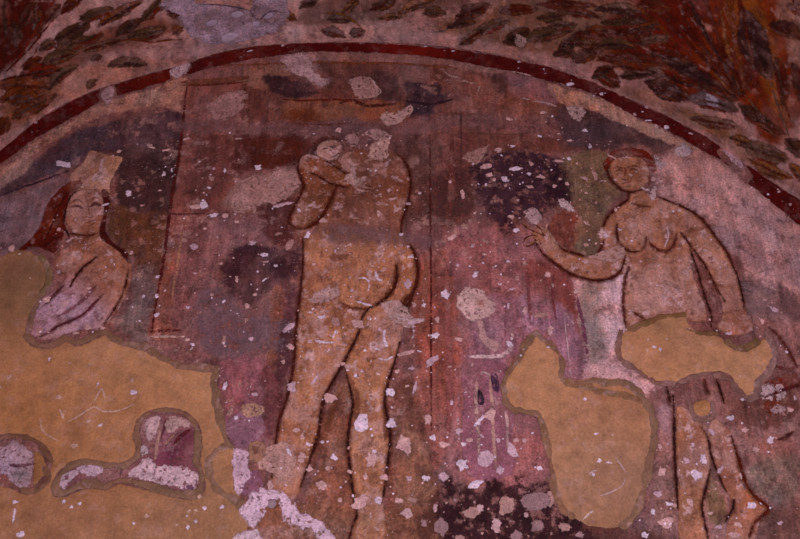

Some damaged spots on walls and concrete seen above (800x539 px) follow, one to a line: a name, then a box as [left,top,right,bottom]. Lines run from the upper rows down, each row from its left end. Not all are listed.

peeling [348,76,381,99]
peeling [335,105,413,186]
peeling [435,287,513,351]
peeling [380,467,465,539]
peeling [462,501,489,521]
peeling [481,491,584,539]